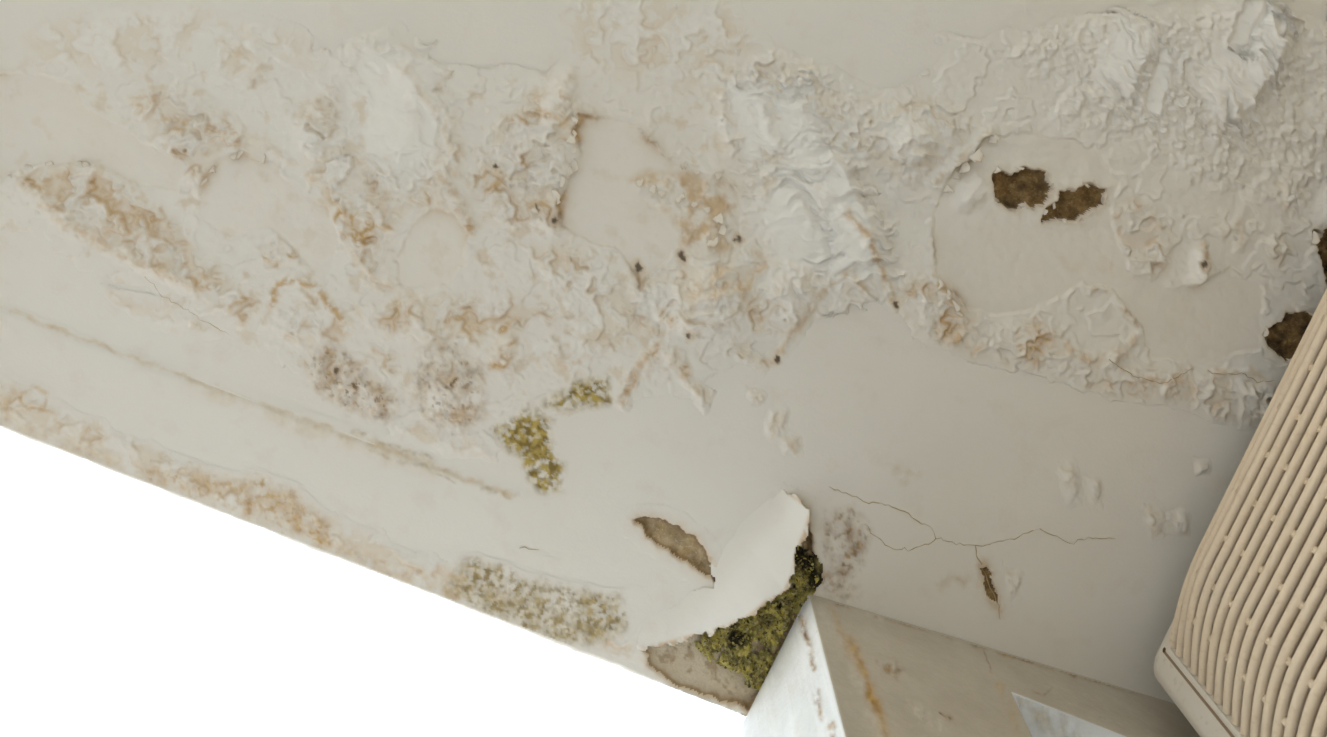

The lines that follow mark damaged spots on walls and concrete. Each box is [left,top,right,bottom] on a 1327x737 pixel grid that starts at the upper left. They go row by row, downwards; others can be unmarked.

peeling [23,57,766,396]
peeling [892,106,1327,431]
spalling [614,336,783,416]
damp [449,551,634,654]
spalling [772,482,819,557]
crack [830,487,1116,618]
spalling [627,627,759,716]
peeling [752,608,841,737]